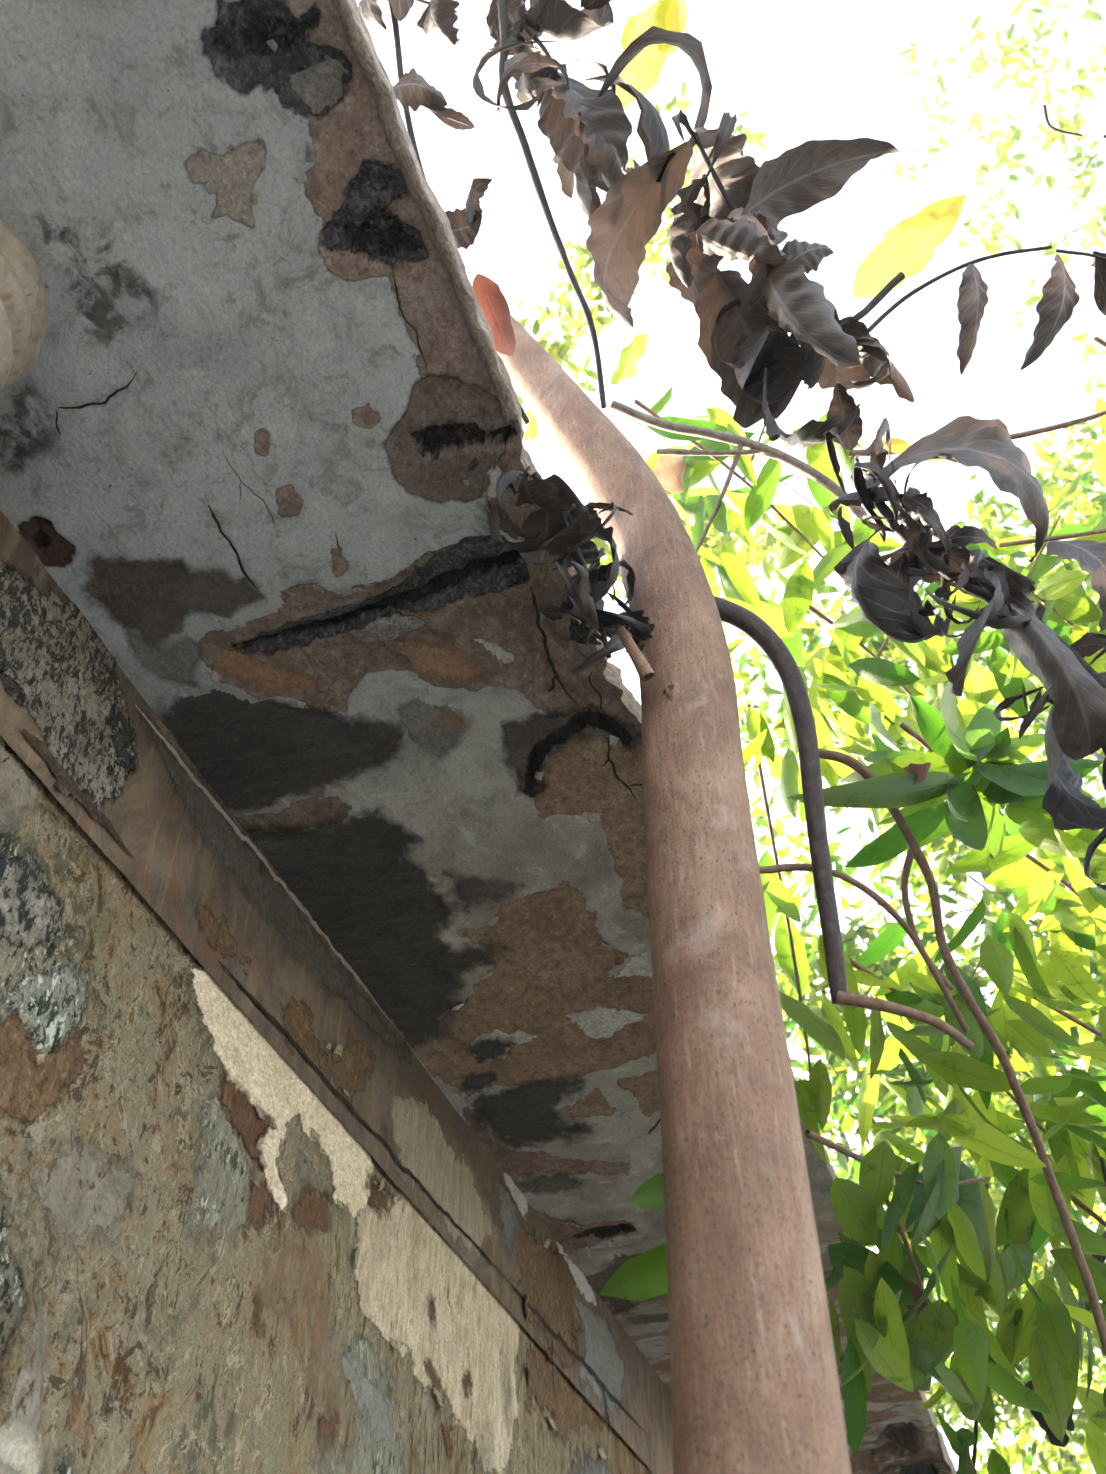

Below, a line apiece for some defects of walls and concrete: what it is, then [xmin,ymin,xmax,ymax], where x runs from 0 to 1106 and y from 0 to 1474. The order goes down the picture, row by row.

peeling [184,138,266,228]
crack [55,366,140,439]
flaking render [198,0,650,926]
crack [208,452,643,803]
peeling [282,997,376,1111]
flaking render [406,881,660,1182]